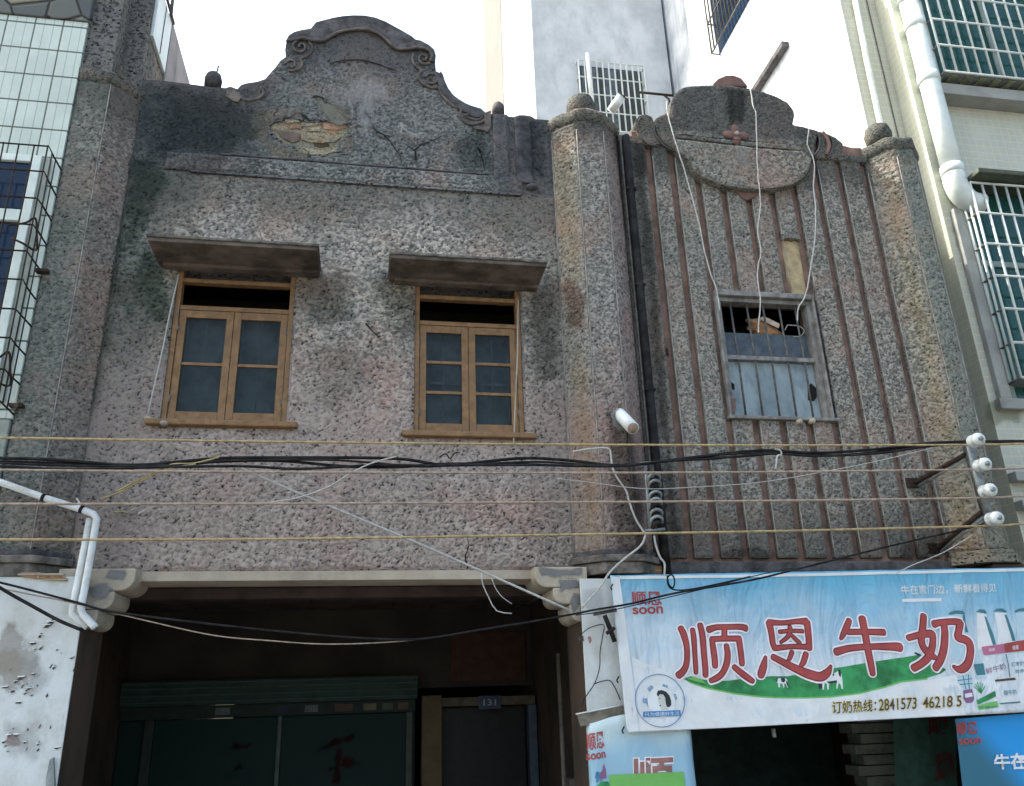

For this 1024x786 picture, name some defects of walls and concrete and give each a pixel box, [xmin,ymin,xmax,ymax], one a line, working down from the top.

flaking render [255,99,352,158]
crack [355,110,445,163]
peeling [0,619,55,704]
peeling [2,725,51,752]